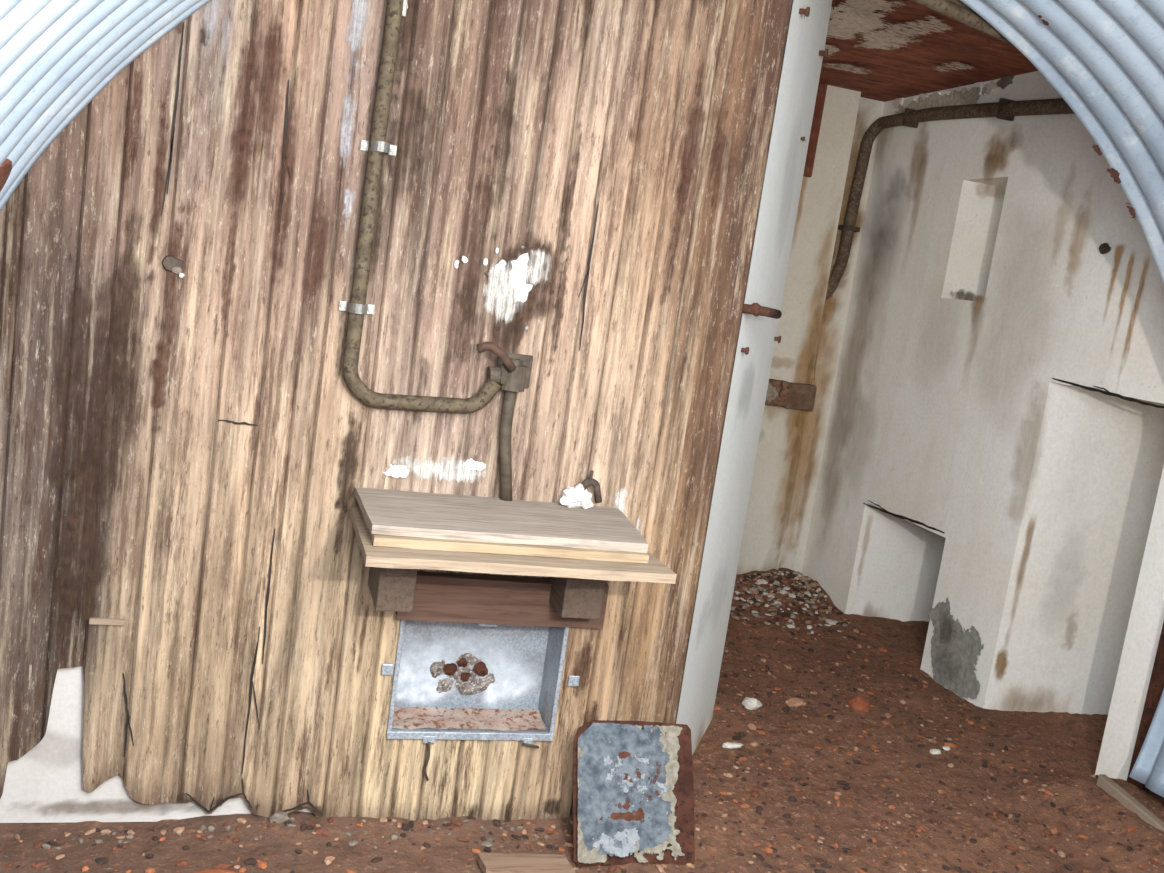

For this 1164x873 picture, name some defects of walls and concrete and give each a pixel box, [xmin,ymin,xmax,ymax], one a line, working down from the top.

peeling [822,0,952,74]
peeling [933,60,973,72]
rust [798,176,806,217]
rust [1107,168,1121,184]
spalling [483,234,559,335]
rust [1109,246,1147,346]
rust [765,312,827,521]